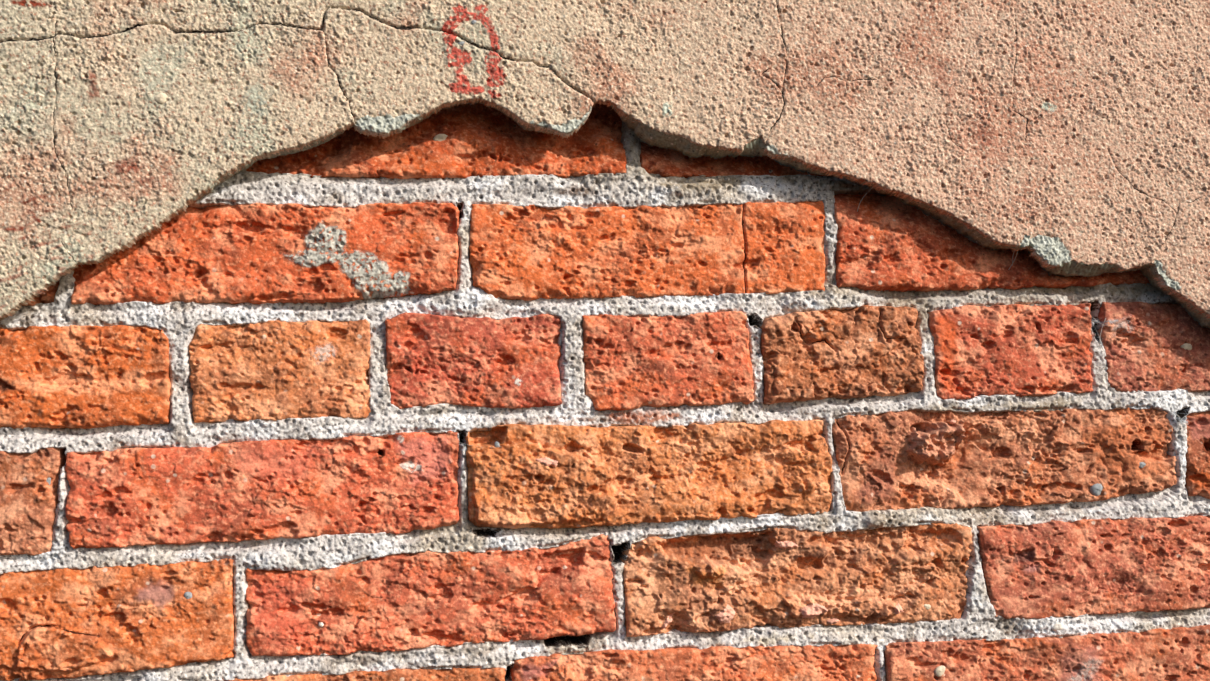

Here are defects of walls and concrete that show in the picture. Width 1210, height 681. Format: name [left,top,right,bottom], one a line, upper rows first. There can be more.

flaking render [0,250,120,321]
crack [0,8,594,208]
peeling [285,223,410,300]
flaking render [138,100,592,237]
crack [761,0,787,145]
flaking render [611,104,1210,329]